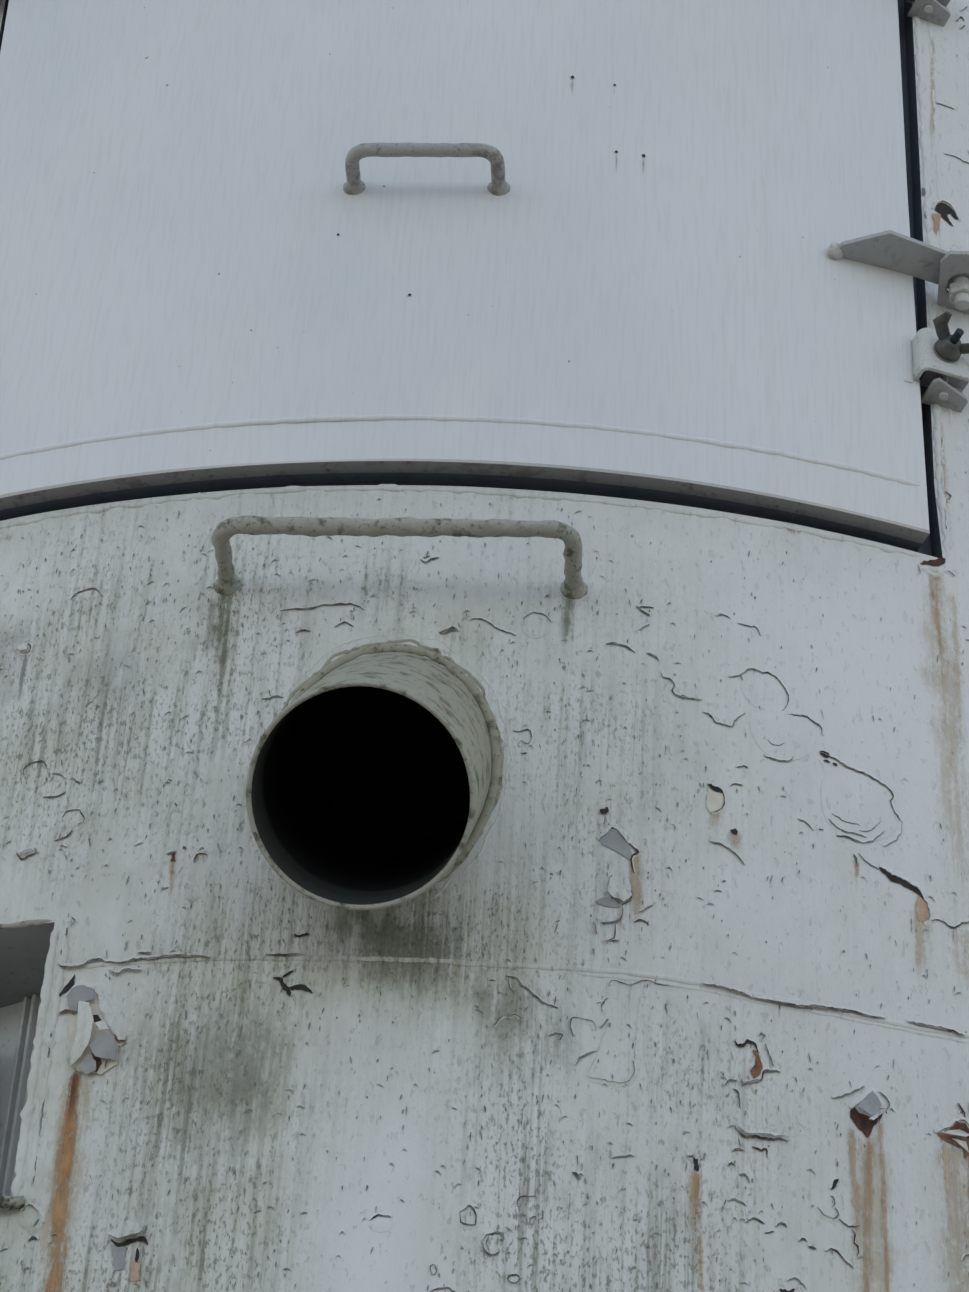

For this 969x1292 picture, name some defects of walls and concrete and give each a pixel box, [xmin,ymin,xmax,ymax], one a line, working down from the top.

peeling [591,807,642,945]
crack [57,913,210,974]
crack [265,930,316,996]
peeling [58,975,128,1075]
crack [494,973,609,1044]
crack [703,981,965,1036]
crack [33,1033,52,1185]
corrosion [46,1073,80,1292]
peeling [722,1030,790,1183]
corrosion [849,1130,859,1213]
peeling [832,1084,892,1138]
peeling [933,1103,969,1159]